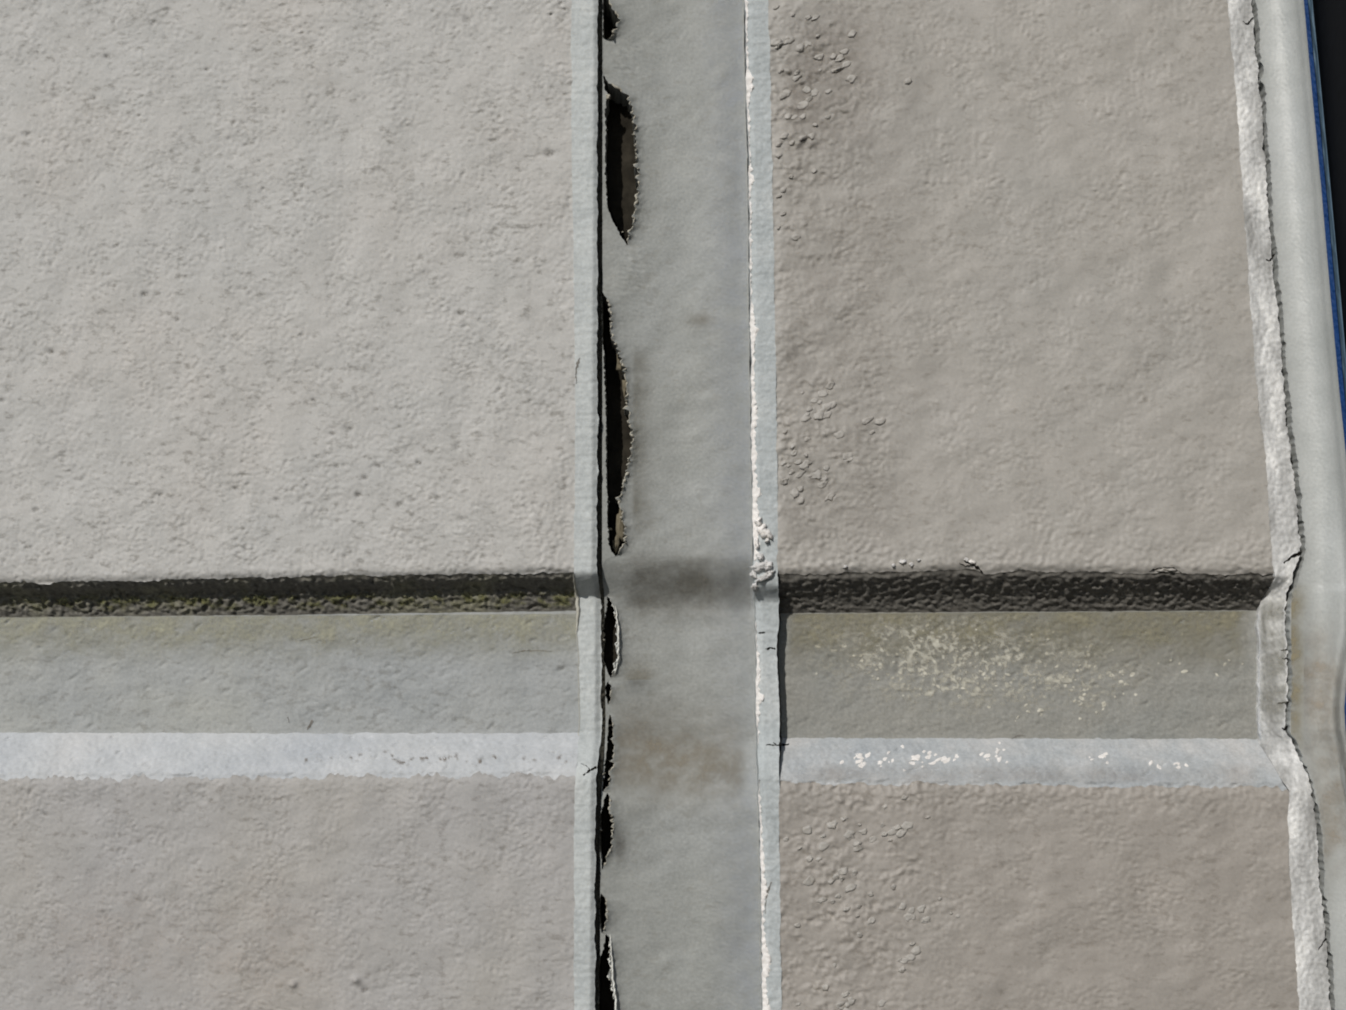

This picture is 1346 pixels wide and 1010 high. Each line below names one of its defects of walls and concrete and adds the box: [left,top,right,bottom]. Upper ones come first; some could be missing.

crack [1284,531,1302,602]
crack [1278,649,1289,730]